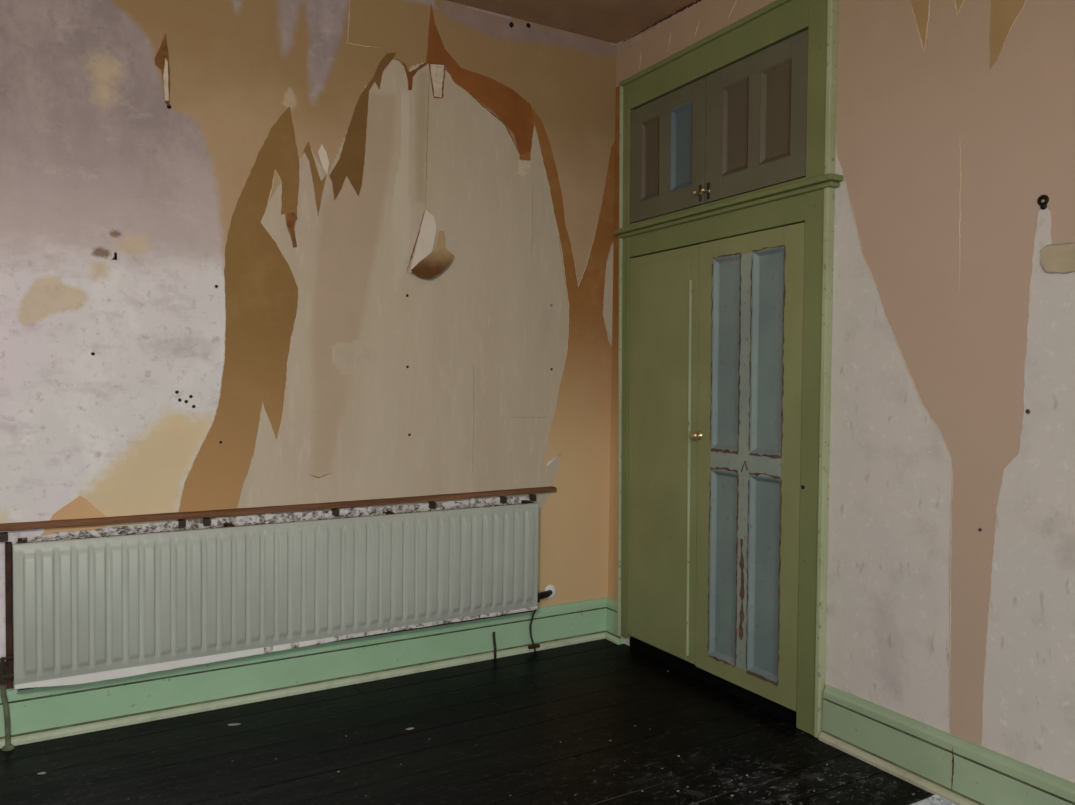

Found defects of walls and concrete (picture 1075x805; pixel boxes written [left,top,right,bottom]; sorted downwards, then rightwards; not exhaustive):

peeling [911,0,930,51]
peeling [989,0,1027,70]
peeling [27,0,702,607]